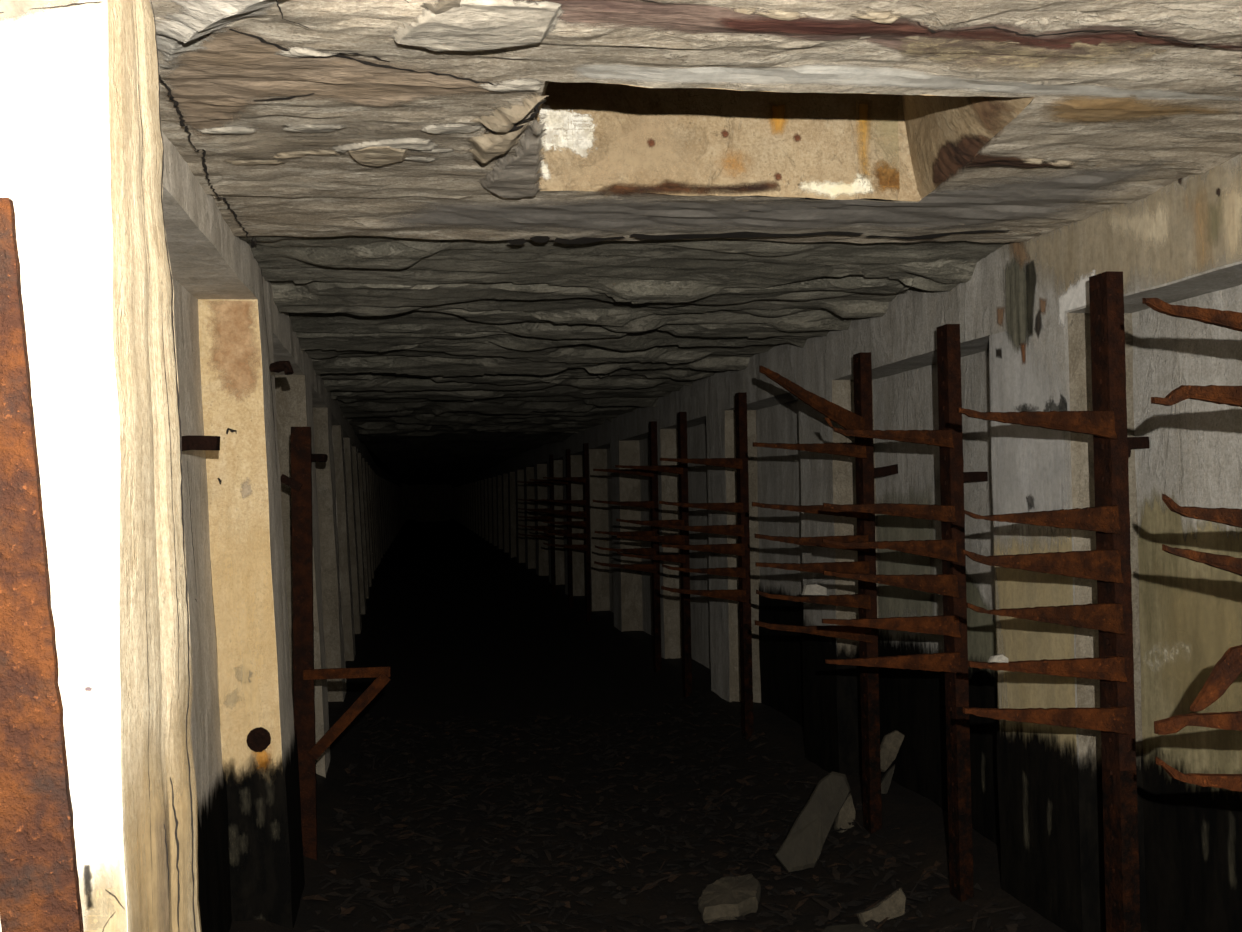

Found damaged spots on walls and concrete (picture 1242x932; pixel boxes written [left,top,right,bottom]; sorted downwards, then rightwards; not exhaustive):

flaking render [163,28,597,198]
rust [599,180,778,194]
spalling [389,0,1242,68]
leakage [400,162,1242,363]
spalling [933,96,1075,187]
crack [84,2,278,932]
leakage [1136,495,1242,932]
leakage [80,729,305,932]